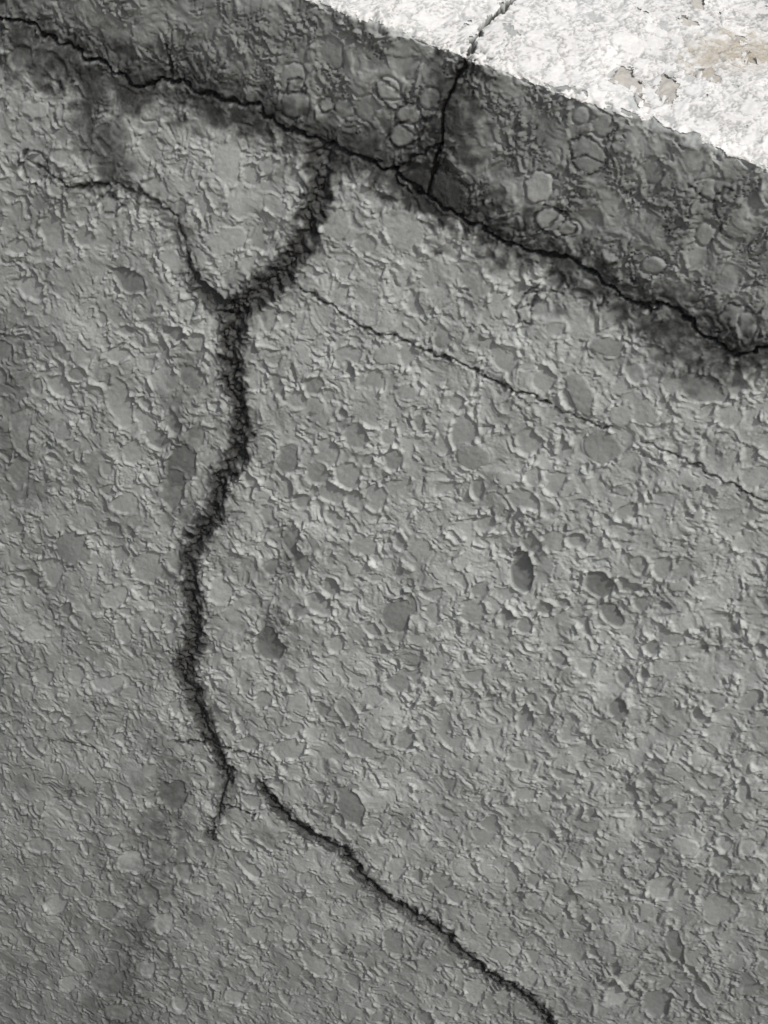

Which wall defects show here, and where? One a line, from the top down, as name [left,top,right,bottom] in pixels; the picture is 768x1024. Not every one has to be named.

crack [349,4,768,357]
crack [0,17,343,839]
crack [359,325,556,407]
crack [256,778,557,1024]